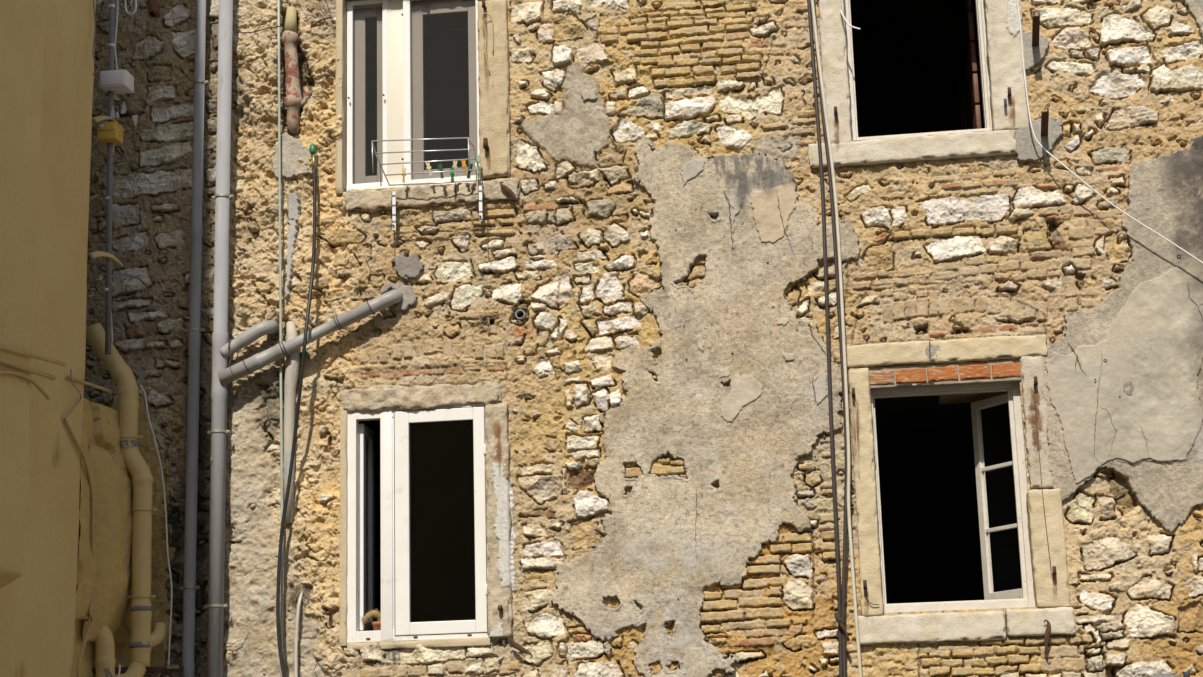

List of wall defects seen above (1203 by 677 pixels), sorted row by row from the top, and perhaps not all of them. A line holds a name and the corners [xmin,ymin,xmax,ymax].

flaking render [1182,0,1203,44]
water stain [714,154,796,203]
flaking render [851,136,1203,534]
flaking render [550,133,861,677]
rust [1029,390,1042,449]
crack [1068,342,1192,467]
spalling [919,635,1099,677]